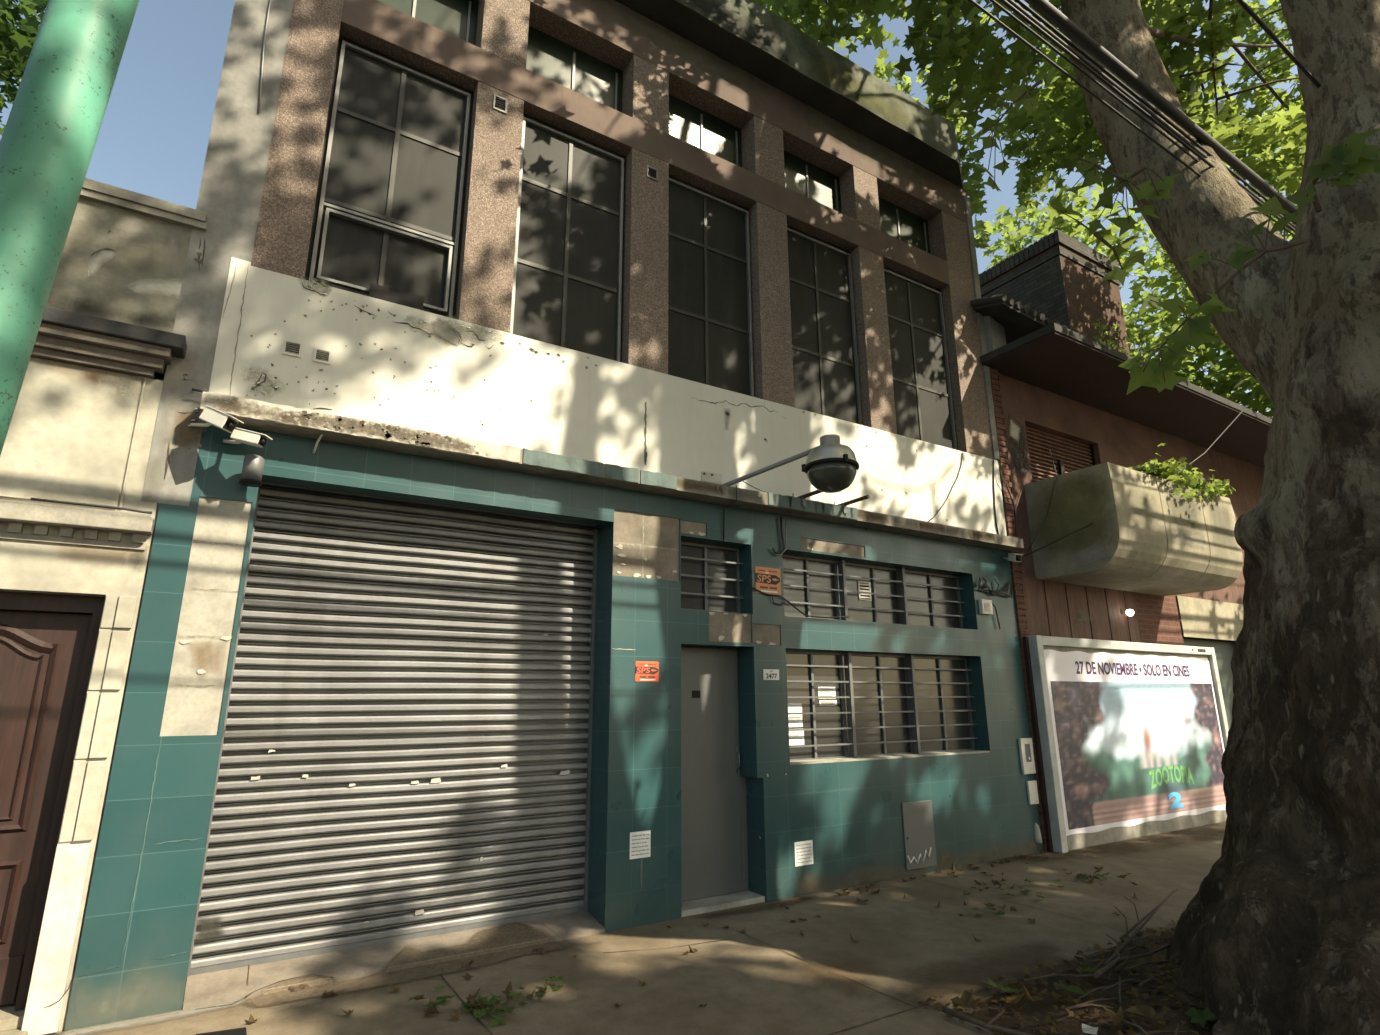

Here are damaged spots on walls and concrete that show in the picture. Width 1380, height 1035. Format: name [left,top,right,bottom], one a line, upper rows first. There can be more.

flaking render [301,280,565,363]
flaking render [179,374,202,449]
peeling [216,320,489,455]
crack [697,399,778,413]